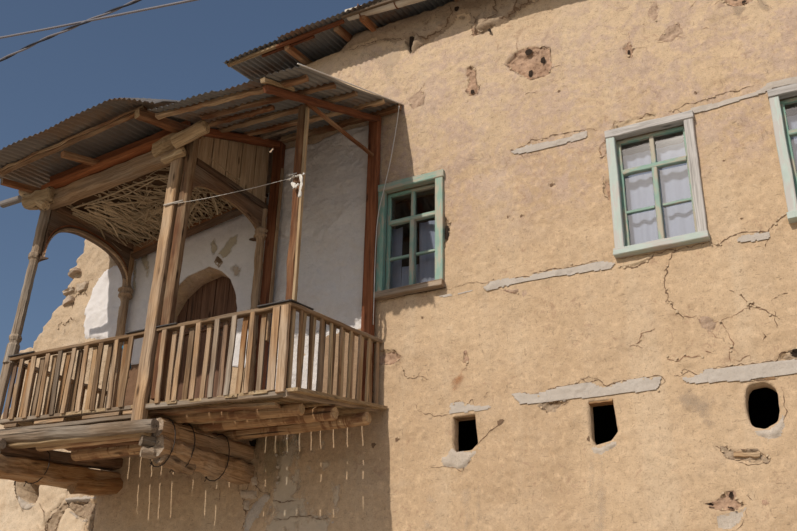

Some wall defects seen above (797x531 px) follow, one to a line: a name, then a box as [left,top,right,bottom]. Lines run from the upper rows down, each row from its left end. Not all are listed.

spalling [715,0,771,8]
spalling [342,0,539,53]
spalling [658,22,683,42]
spalling [465,64,480,96]
spalling [506,43,559,80]
crack [618,214,786,318]
crack [730,290,785,339]
crack [523,322,790,404]
spalling [716,446,771,465]
peeling [243,434,334,531]
spalling [39,501,97,531]
spalling [705,490,752,529]